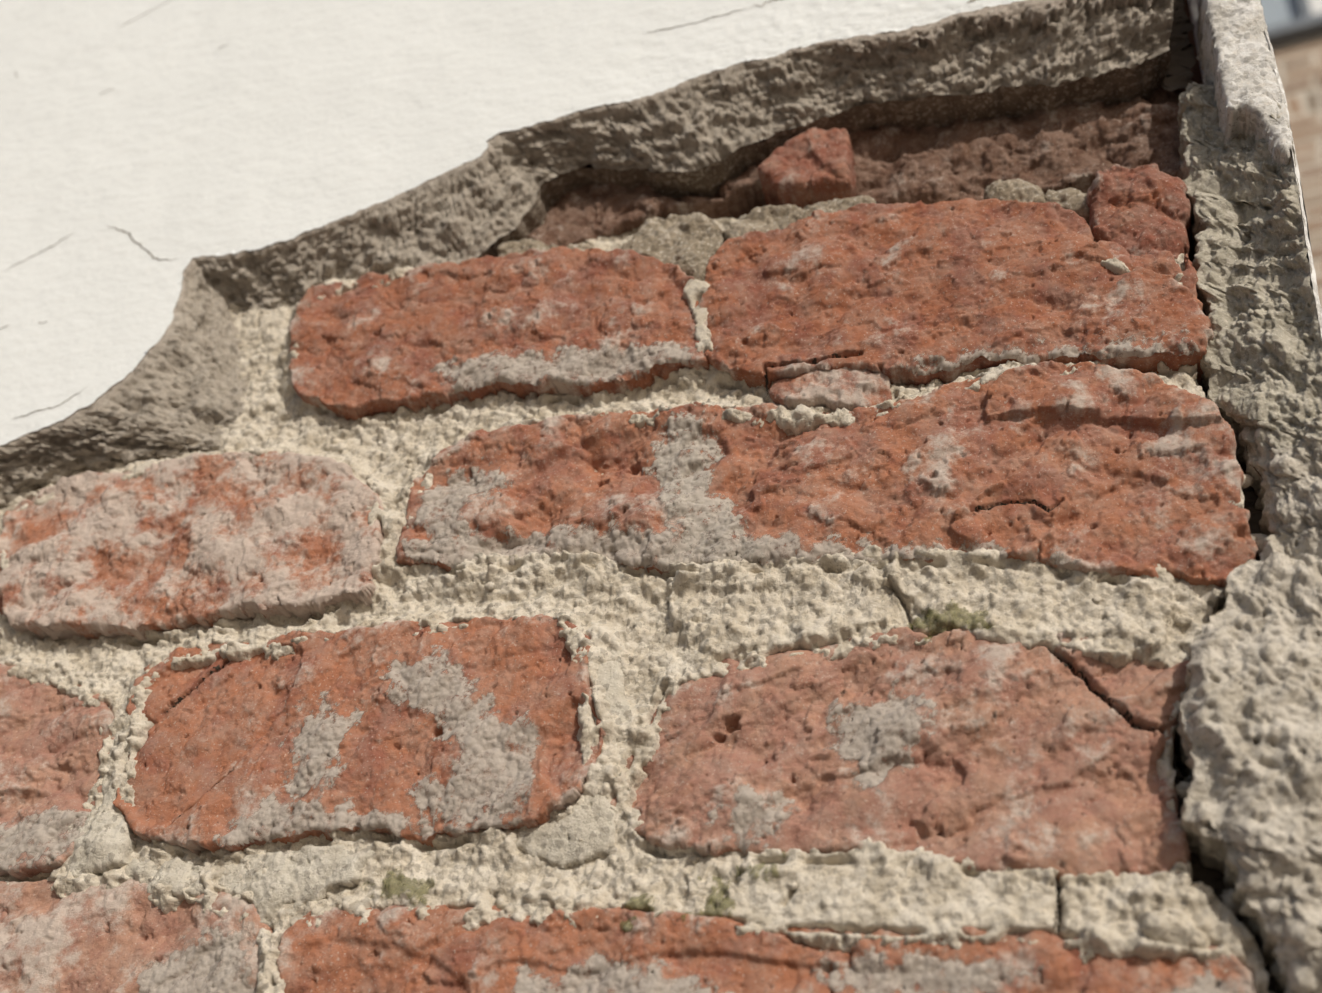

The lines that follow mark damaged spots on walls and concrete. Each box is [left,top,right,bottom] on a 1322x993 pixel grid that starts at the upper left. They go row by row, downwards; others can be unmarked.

crack [1162,0,1196,91]
crack [1199,385,1263,561]
flaking render [596,658,632,724]
crack [1047,648,1277,993]
flaking render [124,856,204,897]
flaking render [218,844,375,930]
flaking render [277,904,1258,993]